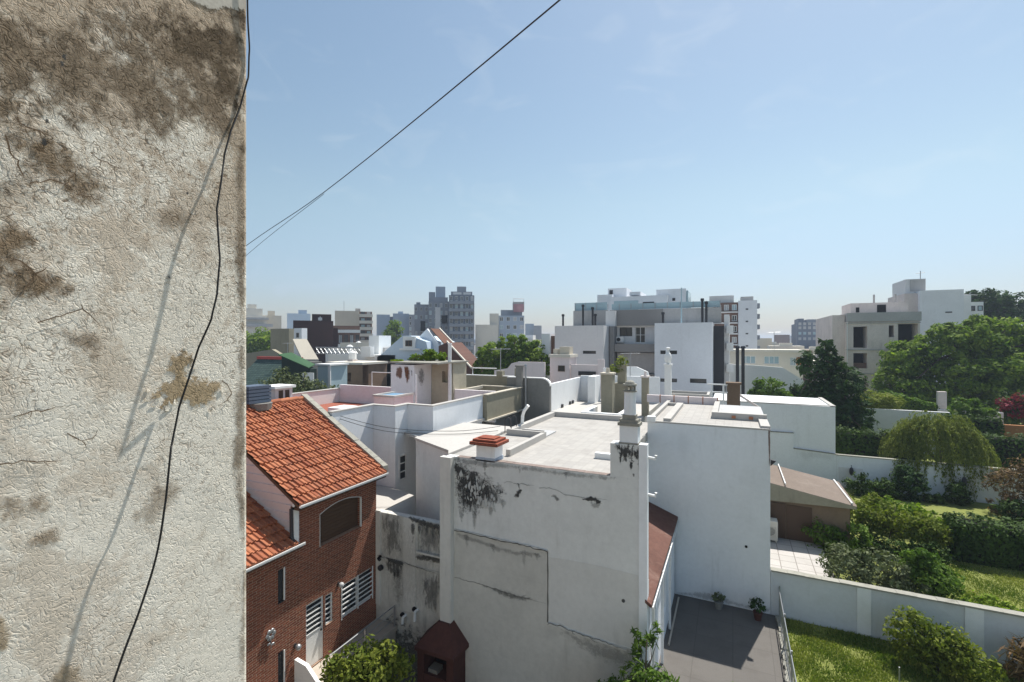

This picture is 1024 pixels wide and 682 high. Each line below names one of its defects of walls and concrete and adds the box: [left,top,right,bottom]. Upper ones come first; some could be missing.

damp [0,3,246,205]
damp [237,231,246,304]
damp [234,386,246,510]
damp [617,440,639,477]
damp [408,516,440,541]
damp [387,558,403,577]